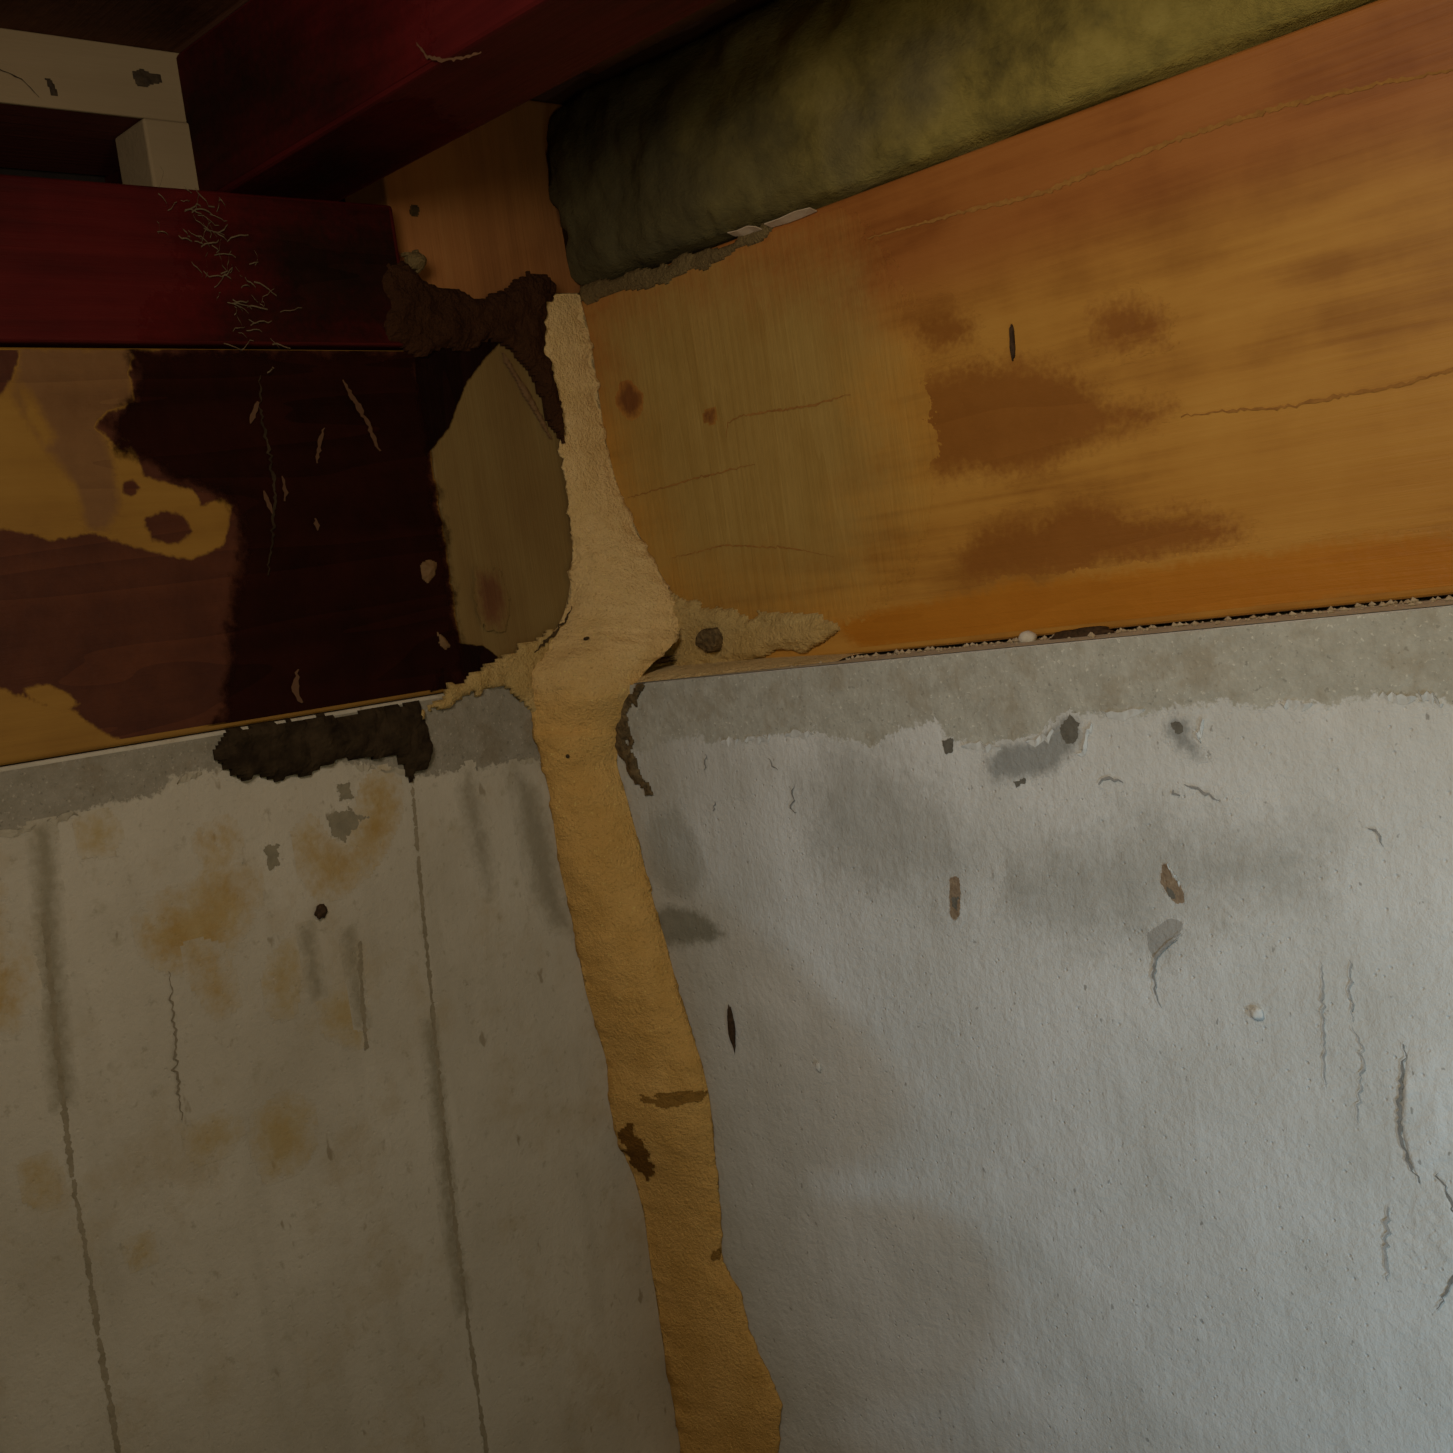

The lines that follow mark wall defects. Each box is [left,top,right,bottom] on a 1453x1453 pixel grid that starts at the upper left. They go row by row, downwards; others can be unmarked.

water stain [0,0,498,740]
water stain [581,207,1453,648]
peeling [0,735,228,838]
peeling [326,687,541,843]
peeling [615,599,1453,796]